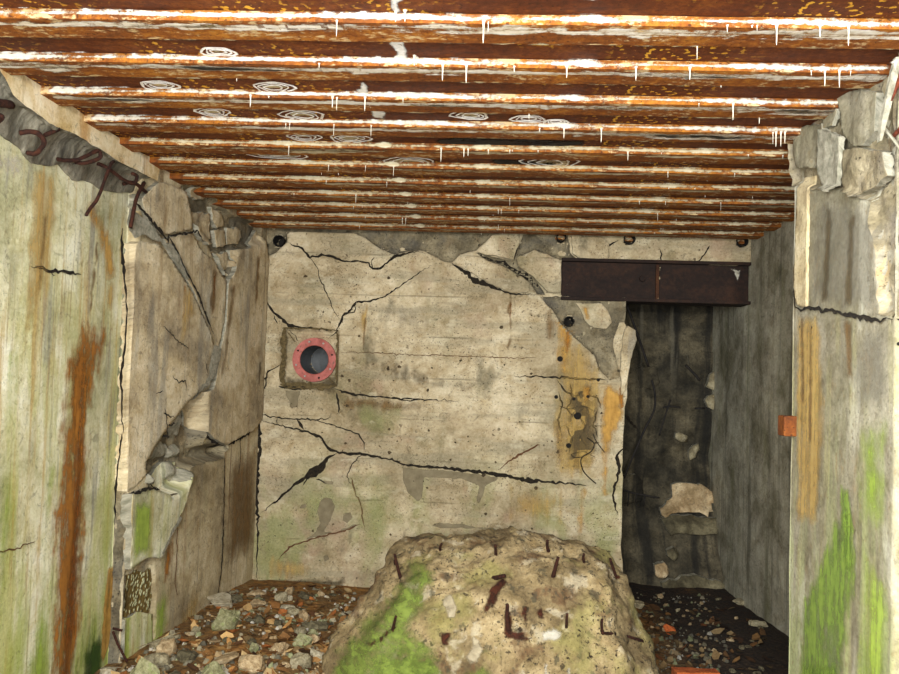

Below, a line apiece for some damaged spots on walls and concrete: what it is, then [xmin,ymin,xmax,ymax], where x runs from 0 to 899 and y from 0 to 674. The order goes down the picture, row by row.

rust [200,47,239,56]
rust [253,82,298,91]
leakage [0,0,899,54]
leakage [0,42,888,241]
spalling [788,77,899,317]
crack [32,266,81,276]
spalling [181,185,620,381]
crack [793,289,899,323]
spalling [145,412,229,496]
crack [206,243,624,592]
rust [51,326,105,674]
leakage [841,489,853,568]